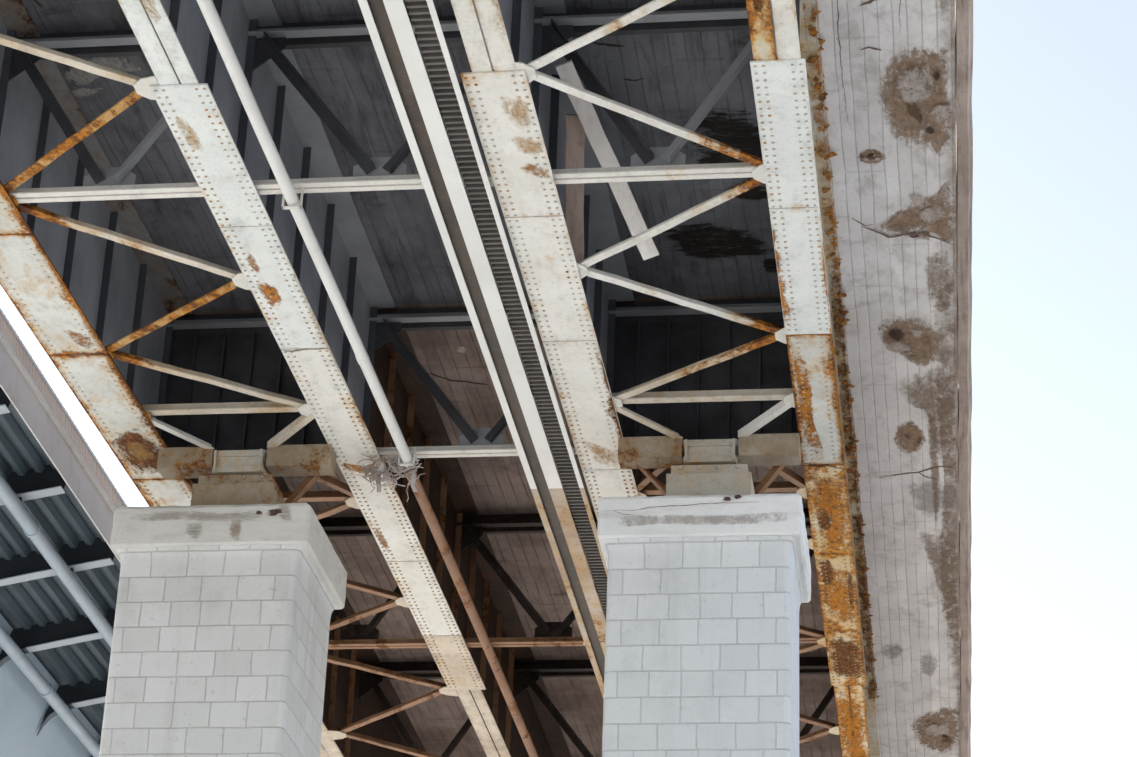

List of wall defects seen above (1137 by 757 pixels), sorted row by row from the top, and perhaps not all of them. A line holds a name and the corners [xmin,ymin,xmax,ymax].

corrosion [753,0,766,20]
corrosion [507,100,527,120]
corrosion [519,139,548,177]
corrosion [248,255,281,306]
corrosion [772,230,792,320]
corrosion [112,365,166,473]
corrosion [793,357,823,454]
corrosion [803,2,879,757]
damp [905,324,959,675]